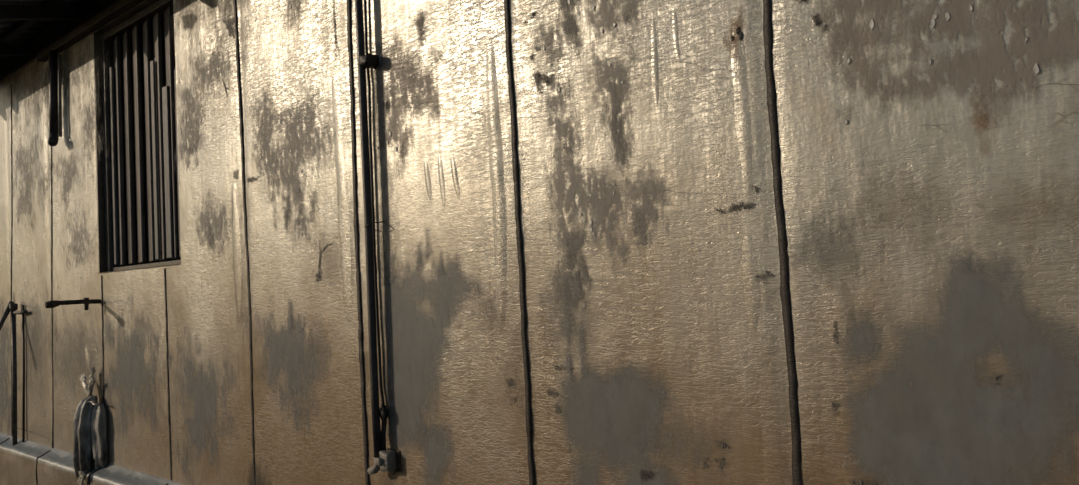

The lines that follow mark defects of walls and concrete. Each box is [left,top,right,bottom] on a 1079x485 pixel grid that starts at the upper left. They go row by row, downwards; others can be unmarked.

peeling [794,0,1079,105]
leakage [105,320,157,431]
leakage [265,303,319,427]
leakage [382,236,478,485]
leakage [562,315,666,485]
leakage [850,257,1079,485]